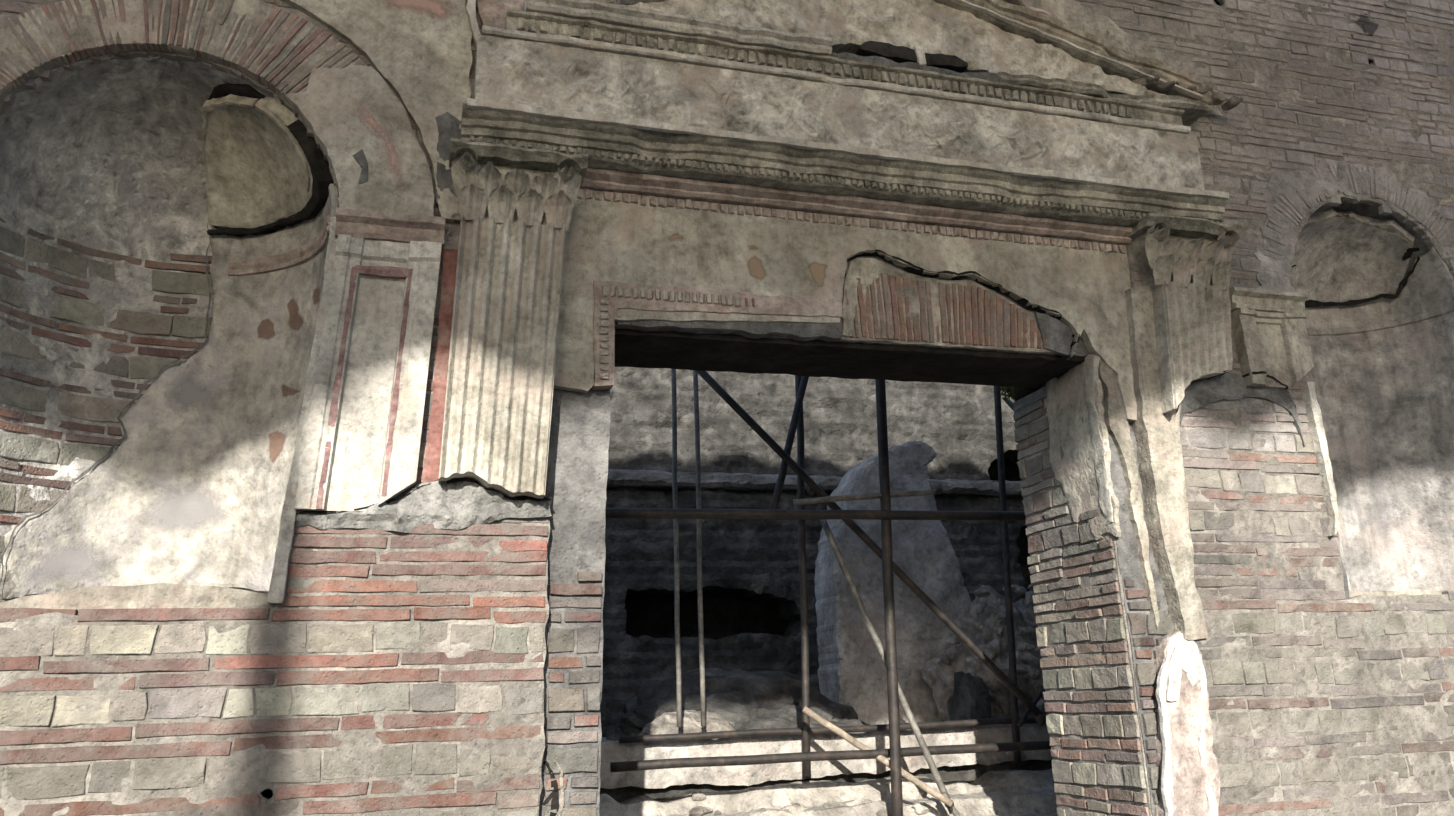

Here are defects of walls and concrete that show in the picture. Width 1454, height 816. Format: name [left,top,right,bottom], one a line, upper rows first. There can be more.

crack [1305,214,1420,307]
spalling [842,250,1080,373]
flaking render [0,224,212,584]
spalling [1175,370,1305,447]
crack [542,760,564,816]